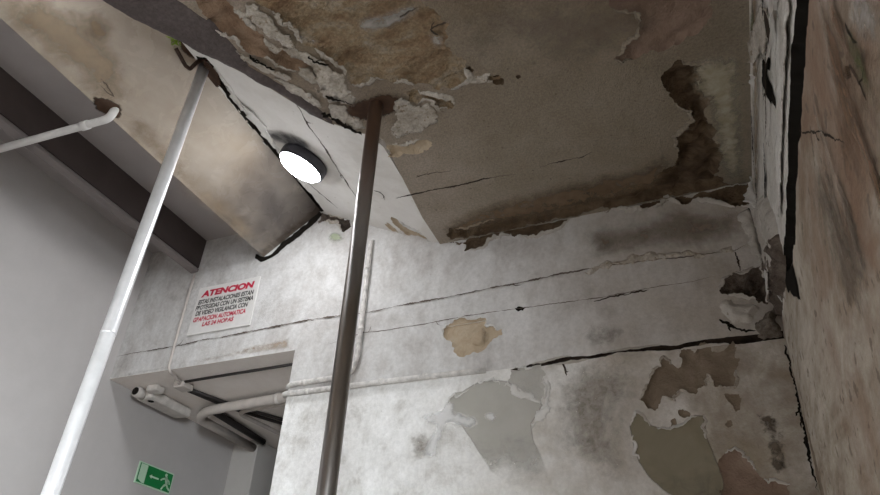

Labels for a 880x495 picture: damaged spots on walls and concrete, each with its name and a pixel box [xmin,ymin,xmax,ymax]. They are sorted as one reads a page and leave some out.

crack [249,55,275,70]
spalling [195,0,504,158]
water stain [697,60,741,176]
crack [121,268,719,356]
spalling [441,316,502,357]
water stain [451,159,662,232]
water stain [596,218,729,250]
crack [612,246,742,270]
crack [719,319,756,333]
spalling [718,234,786,340]
peeling [448,359,588,464]
peeling [630,341,790,495]